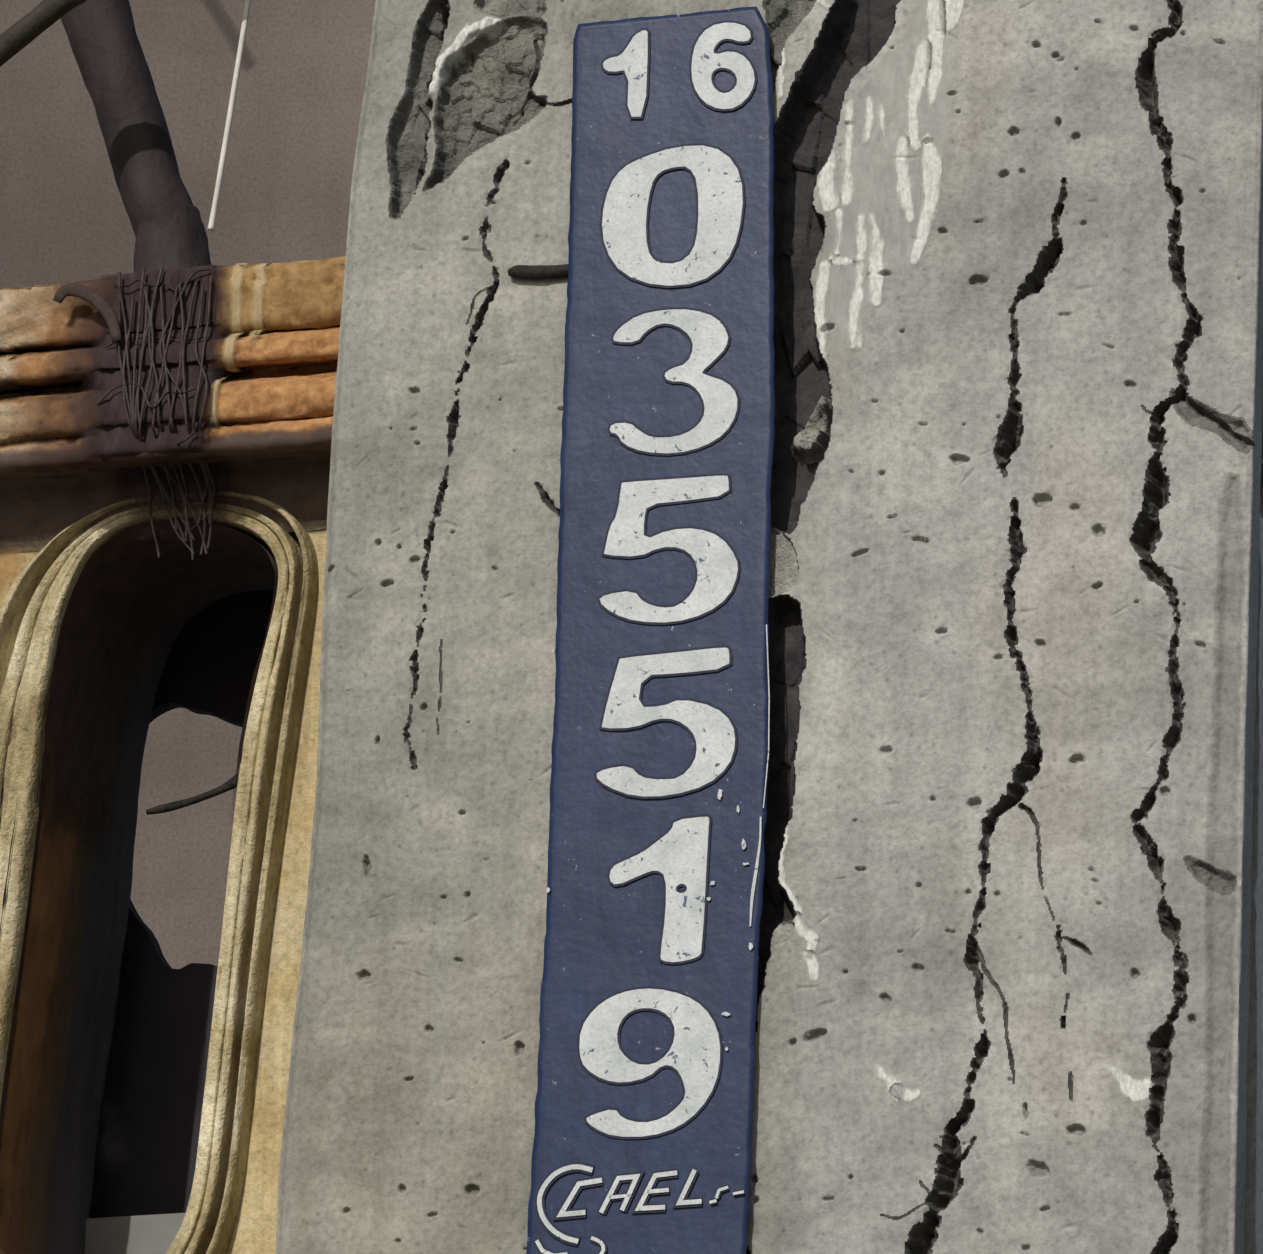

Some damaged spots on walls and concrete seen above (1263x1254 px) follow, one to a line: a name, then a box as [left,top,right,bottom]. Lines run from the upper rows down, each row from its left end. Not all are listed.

crack [414,0,451,195]
spalling [385,0,548,220]
crack [511,39,572,127]
leakage [777,48,786,98]
leakage [814,0,964,359]
crack [403,159,510,770]
crack [534,482,560,517]
crack [880,177,1092,1254]
crack [1129,0,1255,1254]